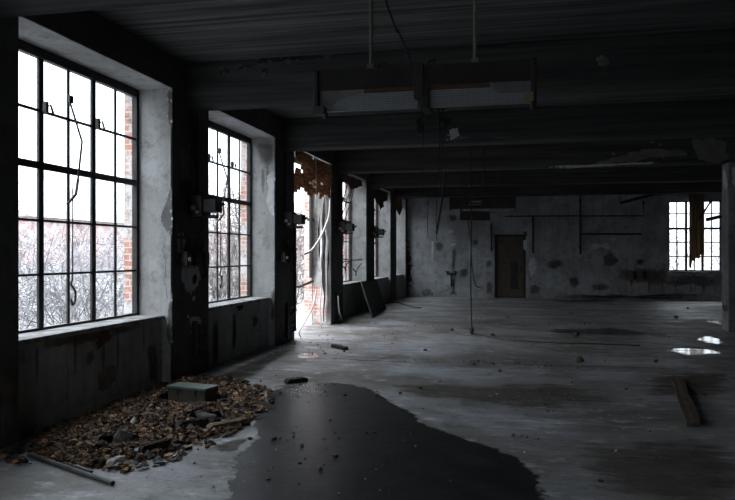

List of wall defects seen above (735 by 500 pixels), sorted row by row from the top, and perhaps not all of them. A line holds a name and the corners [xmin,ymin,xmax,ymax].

peeling [265,171,276,216]
peeling [160,188,186,257]
peeling [181,266,201,301]